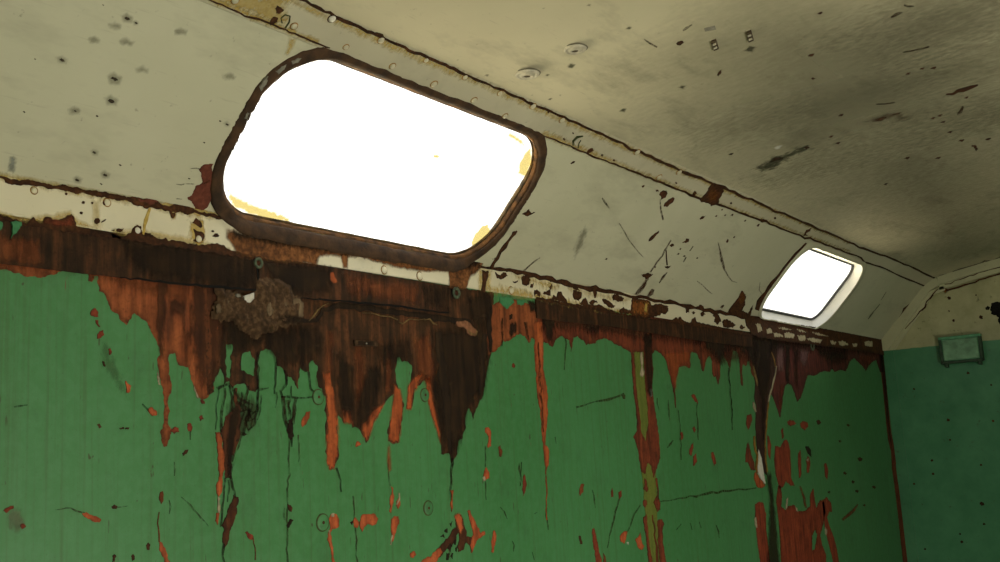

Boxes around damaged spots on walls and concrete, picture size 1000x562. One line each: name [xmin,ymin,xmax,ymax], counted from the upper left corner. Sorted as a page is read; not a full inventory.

water stain [758,146,810,172]
peeling [0,264,61,278]
peeling [88,274,254,476]
corrosion [94,132,925,562]
peeling [456,295,756,530]
peeling [720,291,753,315]